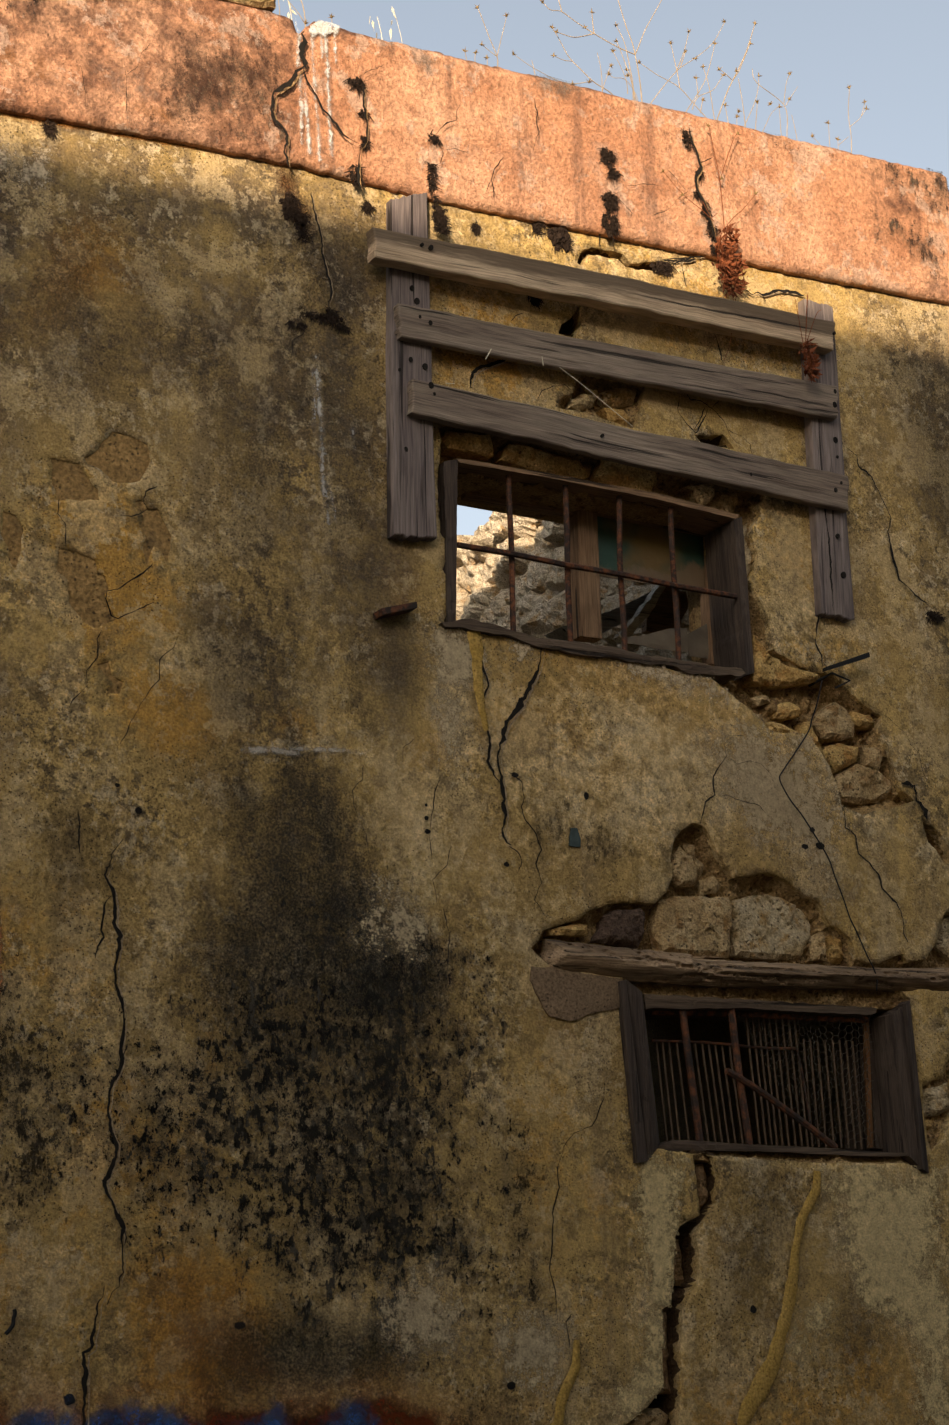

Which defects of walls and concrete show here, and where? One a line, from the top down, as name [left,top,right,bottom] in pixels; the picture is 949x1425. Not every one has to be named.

crack [270,31,383,357]
flaking render [436,423,906,815]
crack [78,814,128,1425]
leakage [0,743,574,1425]
crack [467,631,545,914]
flaking render [532,826,949,968]
flaking render [633,983,908,1013]
crack [737,1171,821,1425]
flaking render [675,1151,909,1164]